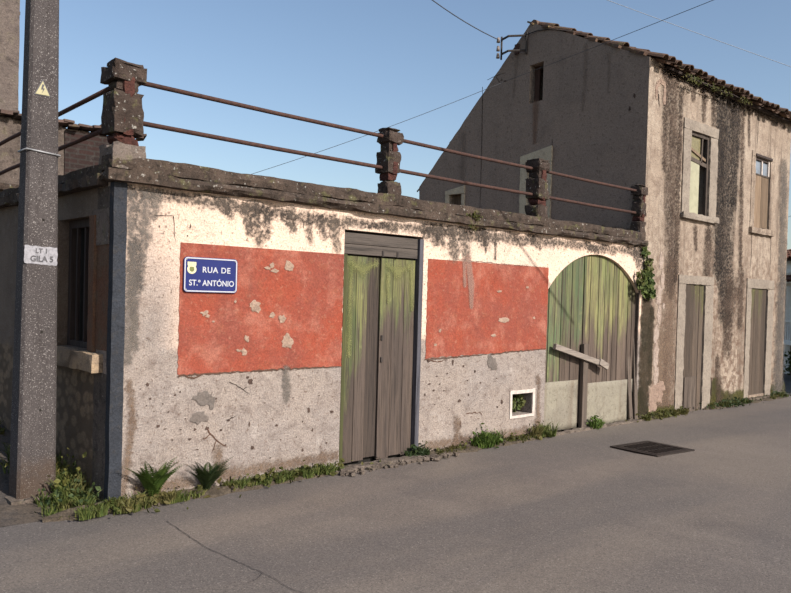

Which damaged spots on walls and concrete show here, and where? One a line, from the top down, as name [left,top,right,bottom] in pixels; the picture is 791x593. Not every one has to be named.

damp [638,65,785,417]
peeling [264,261,294,273]
damp [124,185,652,364]
damp [772,160,788,392]
peeling [250,300,286,323]
peeling [281,333,294,349]
damp [282,366,291,402]